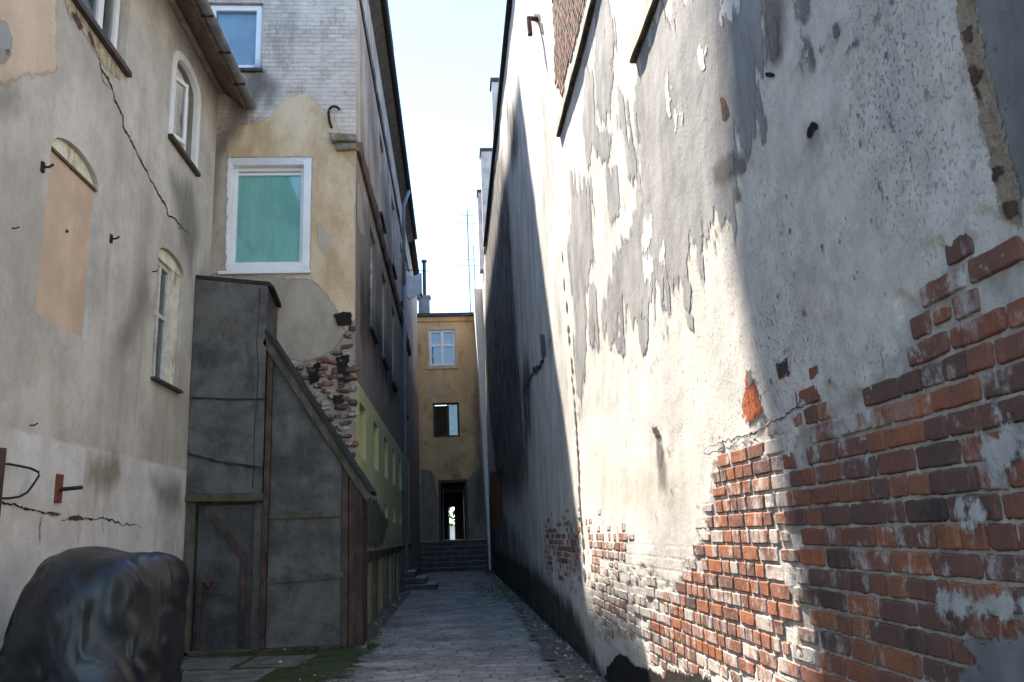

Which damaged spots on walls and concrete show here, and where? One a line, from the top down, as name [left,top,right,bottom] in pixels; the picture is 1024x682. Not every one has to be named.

crack [86,27,193,270]
crack [2,501,141,540]
peeling [210,94,365,458]
crack [703,398,820,449]
flaking render [526,0,1024,682]